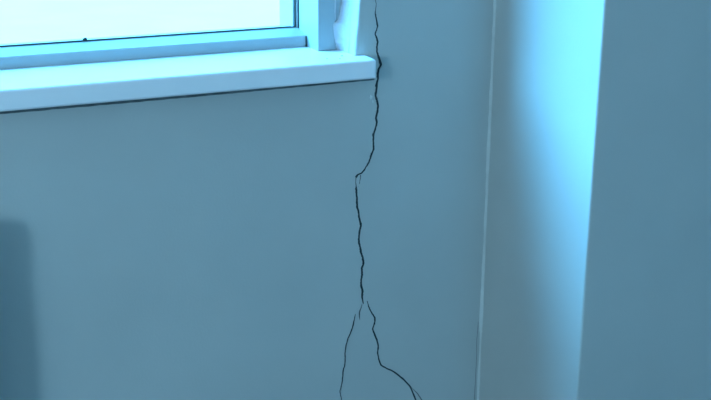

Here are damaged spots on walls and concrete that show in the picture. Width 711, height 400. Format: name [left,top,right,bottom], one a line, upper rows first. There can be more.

crack [0,0,422,400]